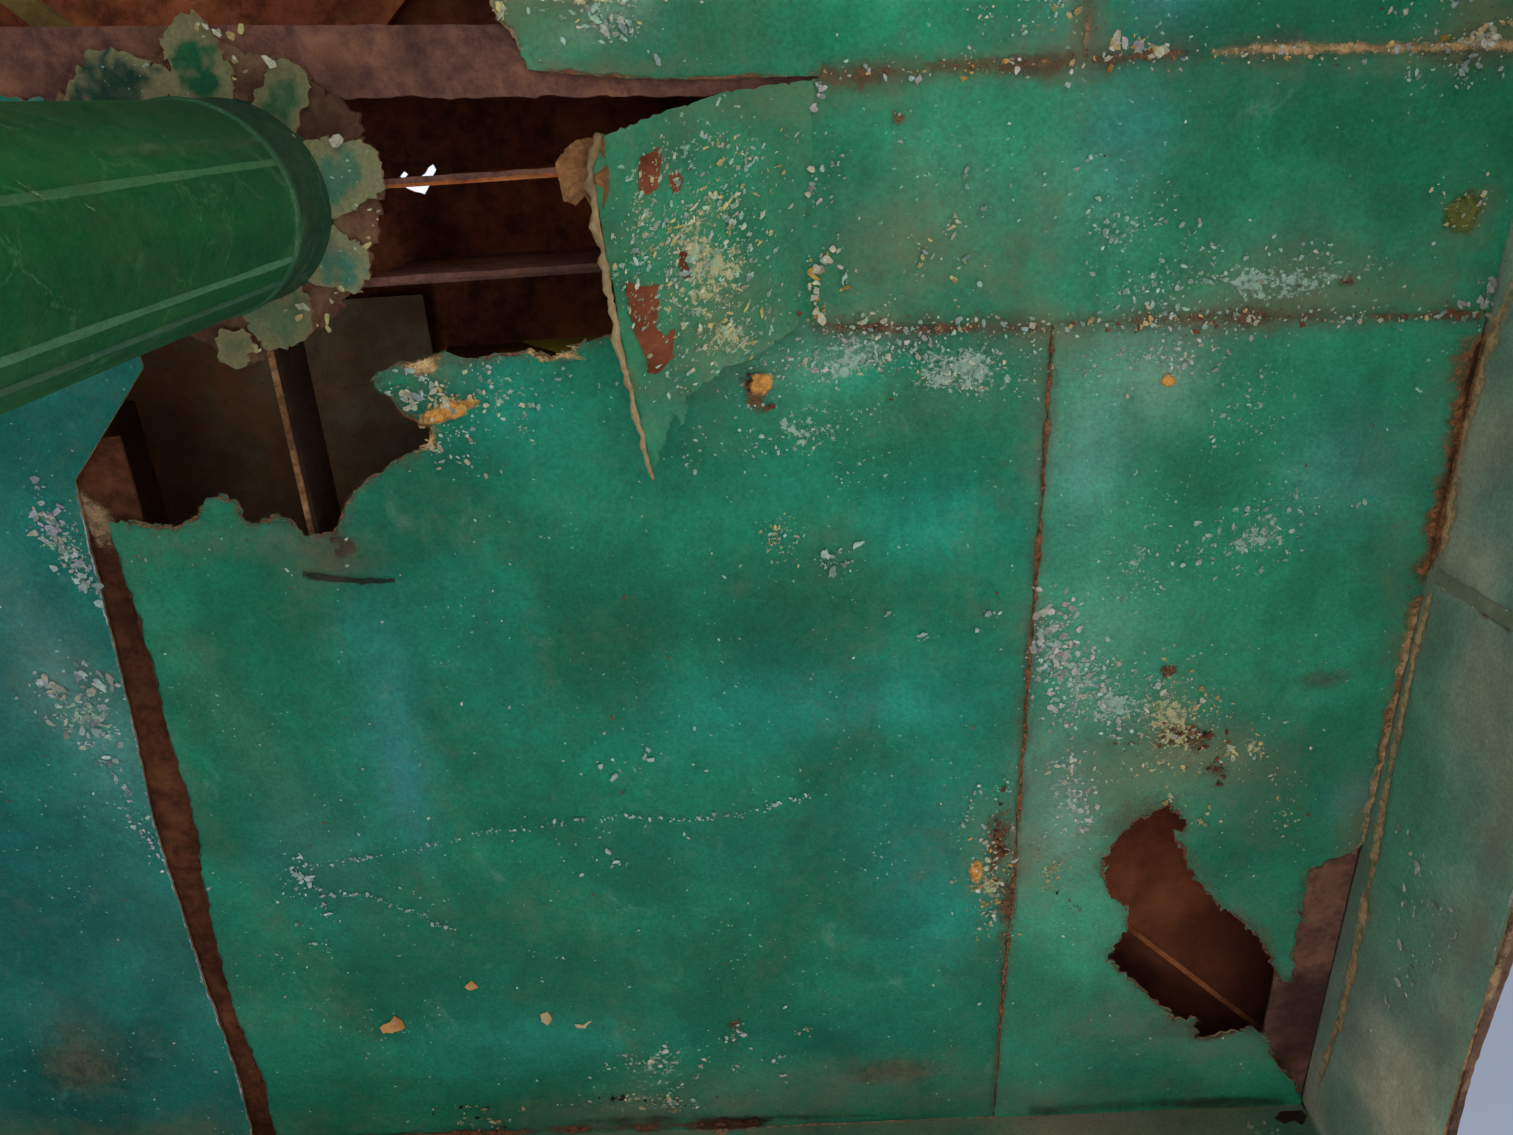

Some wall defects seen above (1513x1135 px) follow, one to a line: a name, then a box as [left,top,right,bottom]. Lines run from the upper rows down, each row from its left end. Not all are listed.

peeling [194,22,248,80]
peeling [261,55,277,69]
rust [1224,38,1513,55]
peeling [329,134,343,147]
rust [638,147,683,196]
peeling [284,286,344,333]
peeling [379,361,573,479]
rust [310,394,476,537]
rust [1305,283,1513,1085]
rust [76,491,295,1135]
peeling [457,1105,528,1132]
rust [391,1116,938,1135]